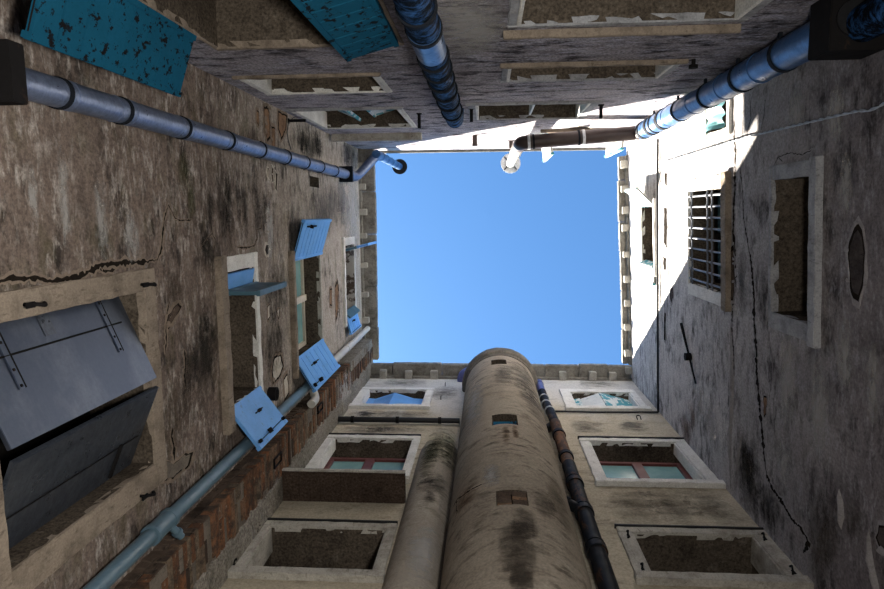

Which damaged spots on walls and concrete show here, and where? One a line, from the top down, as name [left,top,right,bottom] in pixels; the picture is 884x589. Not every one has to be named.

flaking render [255,102,288,147]
crack [0,204,192,285]
crack [730,99,815,555]
flaking render [270,350,290,401]
water stain [504,515,536,589]